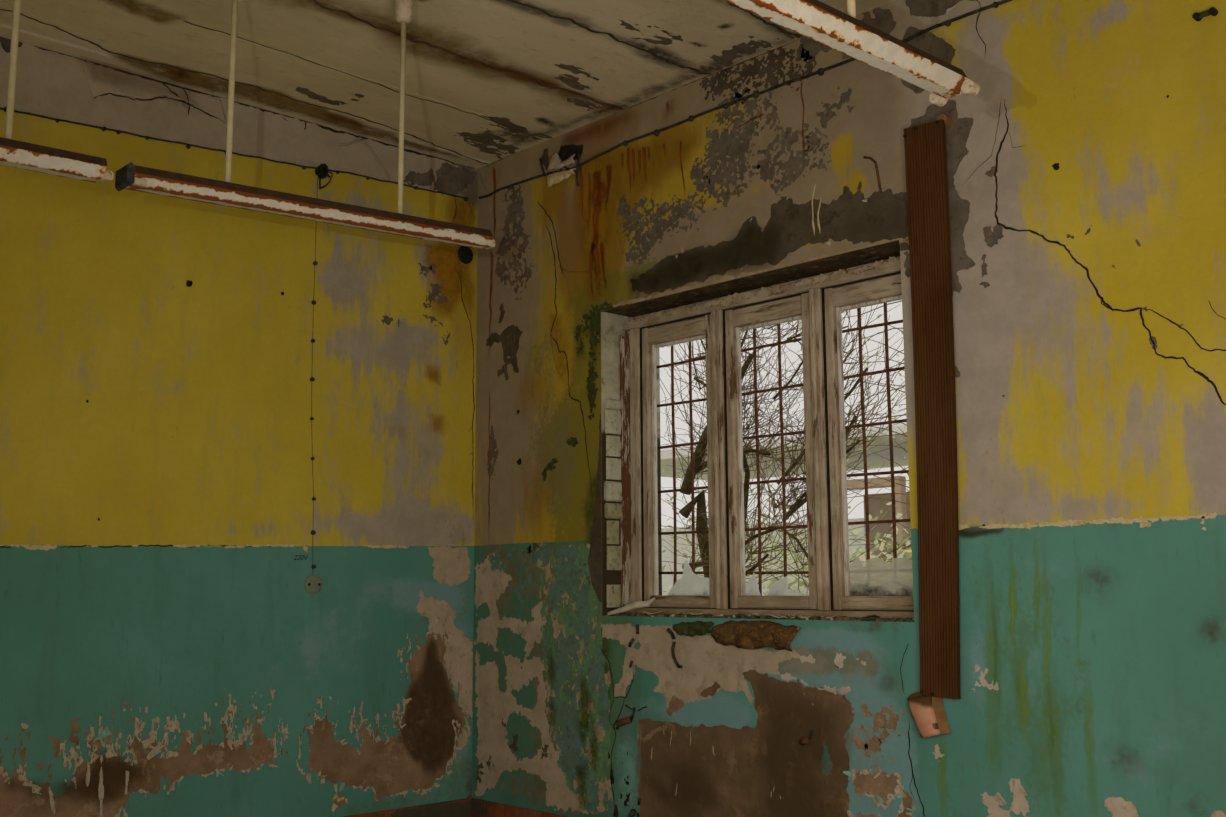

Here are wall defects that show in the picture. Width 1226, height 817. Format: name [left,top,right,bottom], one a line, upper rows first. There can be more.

flaking render [860,0,963,64]
corrosion [579,142,685,292]
flaking render [612,37,910,327]
flaking render [901,79,1004,298]
crack [961,97,1226,405]
water stain [575,301,613,420]
flaking render [0,415,916,817]
water stain [403,643,460,770]
water stain [65,758,139,800]
peeling [980,778,1030,817]
peeling [1104,794,1138,817]